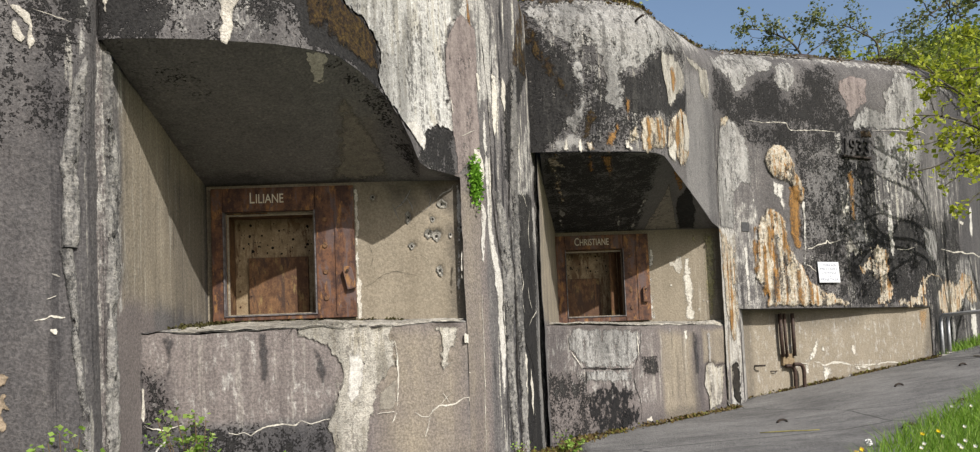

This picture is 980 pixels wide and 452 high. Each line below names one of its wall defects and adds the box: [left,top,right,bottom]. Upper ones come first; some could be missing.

spalling [345,0,480,174]
spalling [523,2,795,132]
spalling [424,199,462,242]
peeling [0,374,10,432]
crack [229,419,328,436]
spalling [170,318,466,452]
water stain [579,383,641,433]